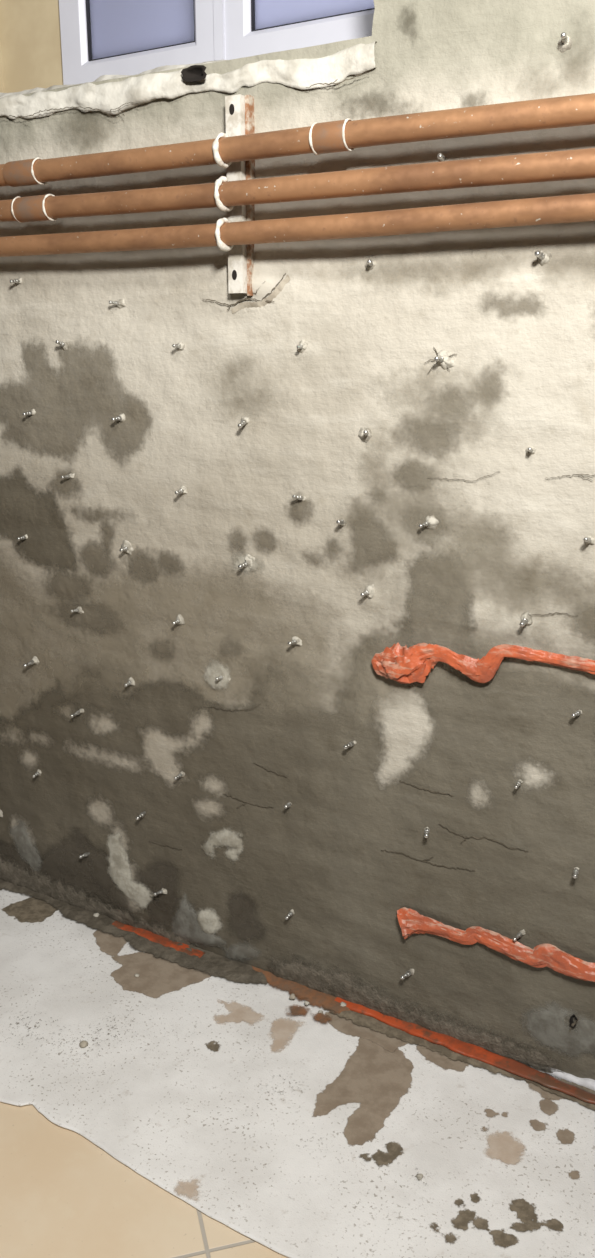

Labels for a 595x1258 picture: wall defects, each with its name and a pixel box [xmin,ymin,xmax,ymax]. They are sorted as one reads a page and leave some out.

crack [545,473,594,481]
water stain [0,345,595,1080]
crack [381,824,526,871]
water stain [313,1010,470,1167]
water stain [525,1080,575,1144]